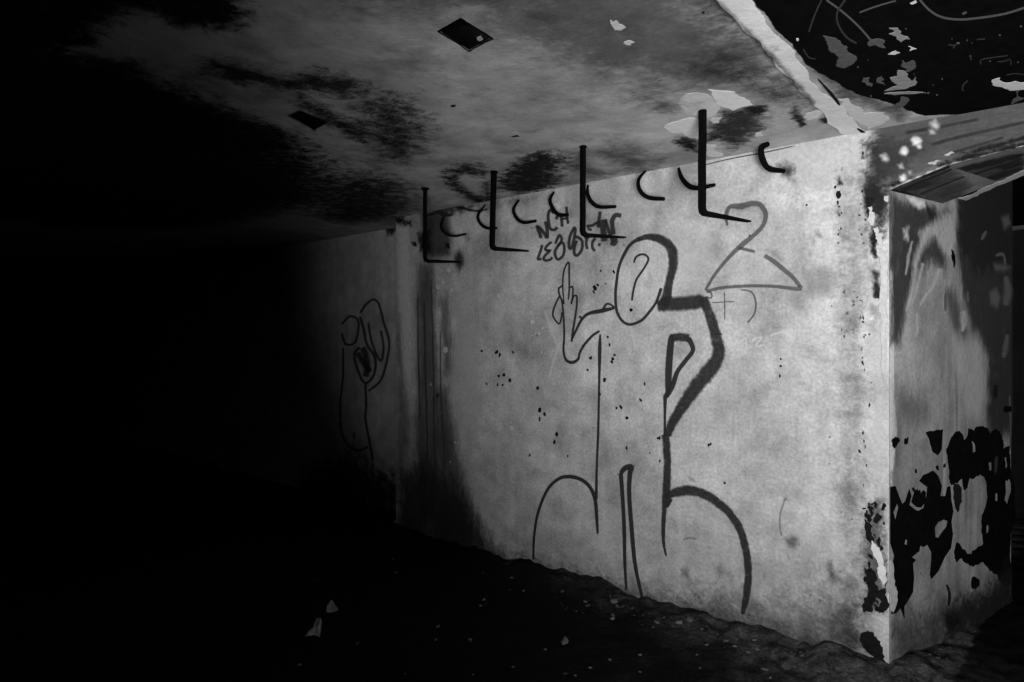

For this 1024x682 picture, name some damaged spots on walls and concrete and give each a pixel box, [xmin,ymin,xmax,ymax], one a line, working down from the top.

peeling [753,0,1024,130]
peeling [1012,176,1024,226]
peeling [841,426,1016,618]